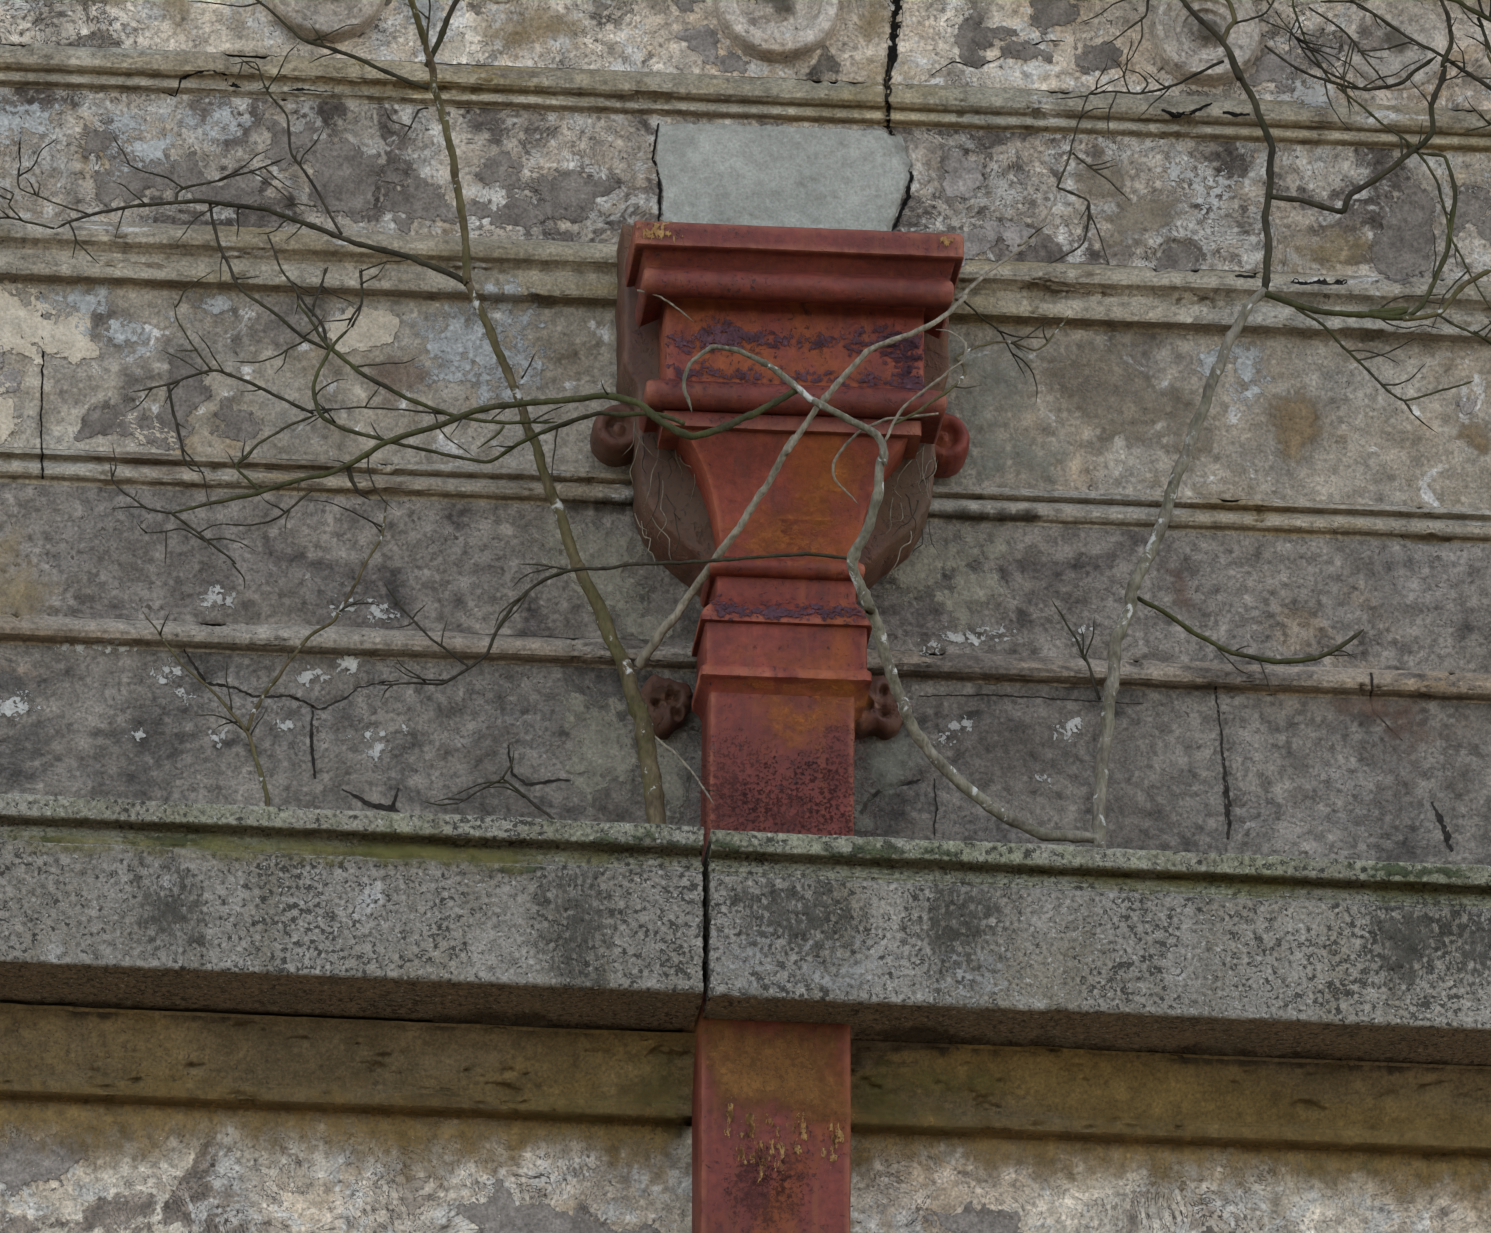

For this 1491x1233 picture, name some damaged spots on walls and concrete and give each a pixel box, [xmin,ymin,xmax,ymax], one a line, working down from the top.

crack [884,0,903,136]
crack [932,40,1065,75]
flaking render [954,0,1123,78]
crack [891,168,914,231]
crack [183,649,400,812]
crack [508,745,572,787]
crack [1214,686,1232,840]
rust [702,1019,847,1118]
flaking render [0,1132,89,1202]
flaking render [455,1179,660,1233]